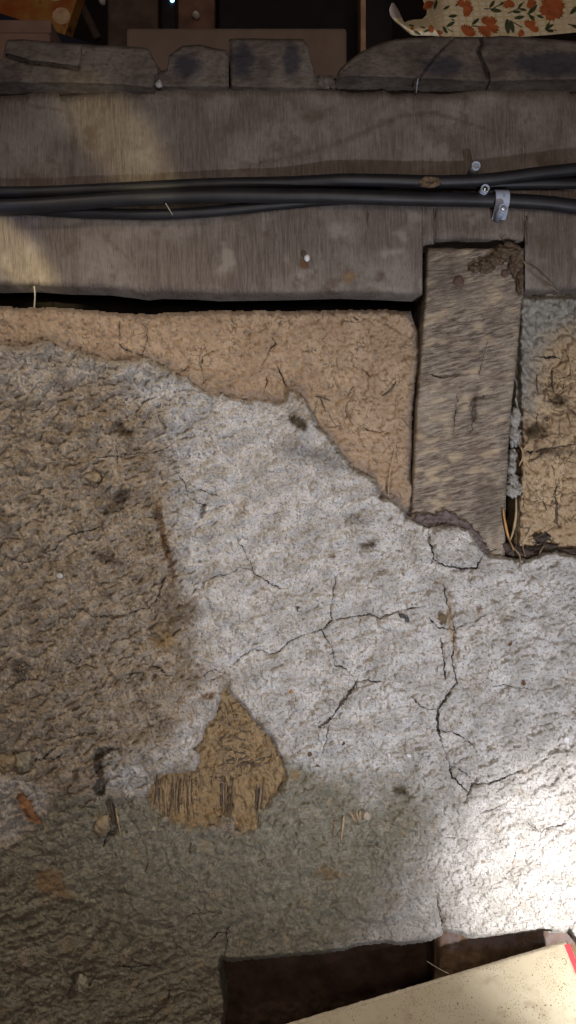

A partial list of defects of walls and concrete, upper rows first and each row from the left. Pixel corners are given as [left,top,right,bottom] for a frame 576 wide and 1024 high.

spalling [0,306,490,554]
spalling [507,294,576,558]
spalling [147,687,286,835]
crack [115,534,518,811]